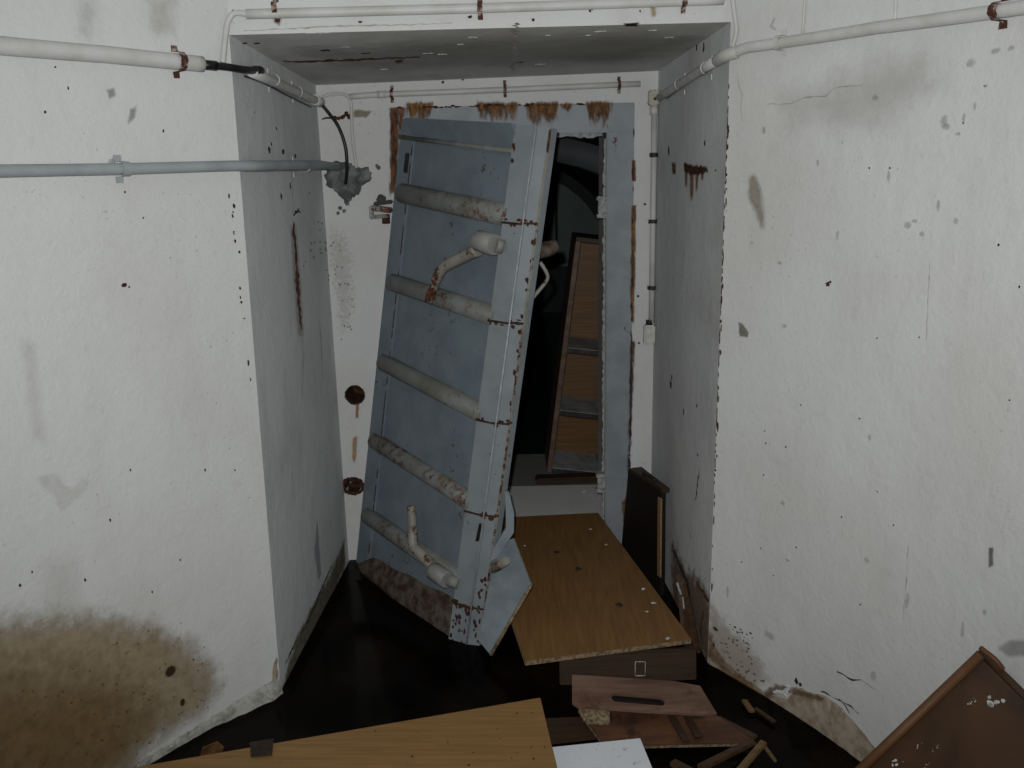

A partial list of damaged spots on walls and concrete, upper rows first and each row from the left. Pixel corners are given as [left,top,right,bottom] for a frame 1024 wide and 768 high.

rust [389,101,610,193]
rust [672,163,708,198]
rust [628,205,636,468]
damp [0,617,211,768]